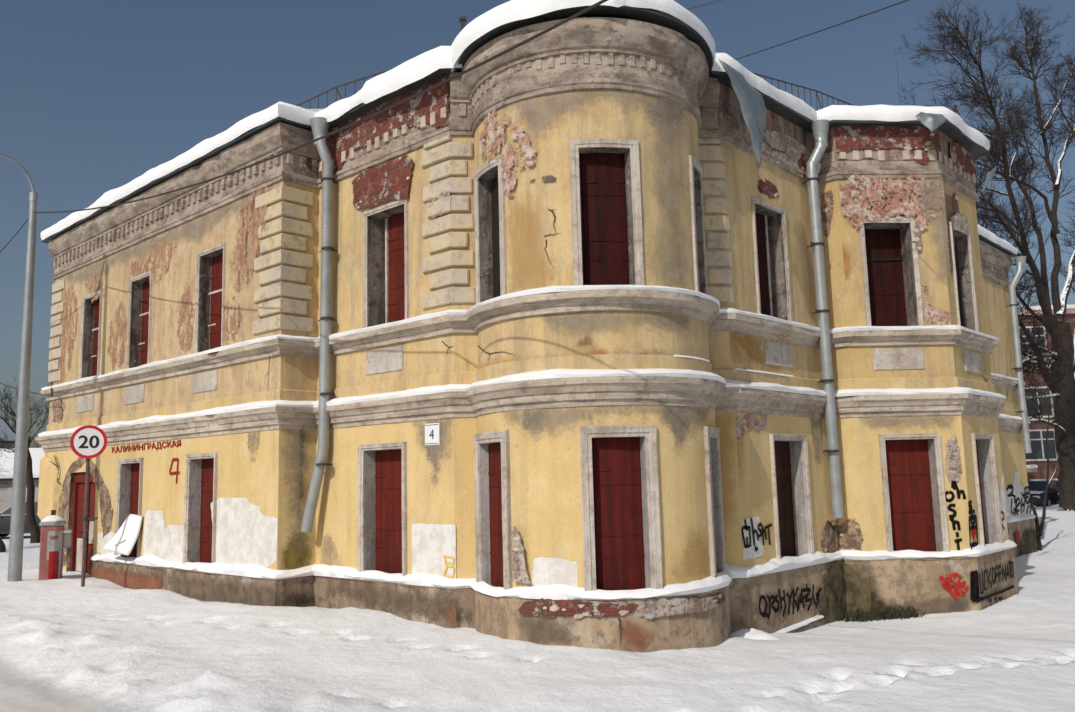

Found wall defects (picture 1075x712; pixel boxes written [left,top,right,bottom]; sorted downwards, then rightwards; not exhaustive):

flaking render [305,74,449,179]
flaking render [352,154,413,211]
flaking render [479,109,556,201]
flaking render [757,178,779,199]
flaking render [761,130,812,177]
flaking render [821,126,976,251]
crack [544,209,558,267]
flaking render [945,435,962,486]
flaking render [518,593,725,619]